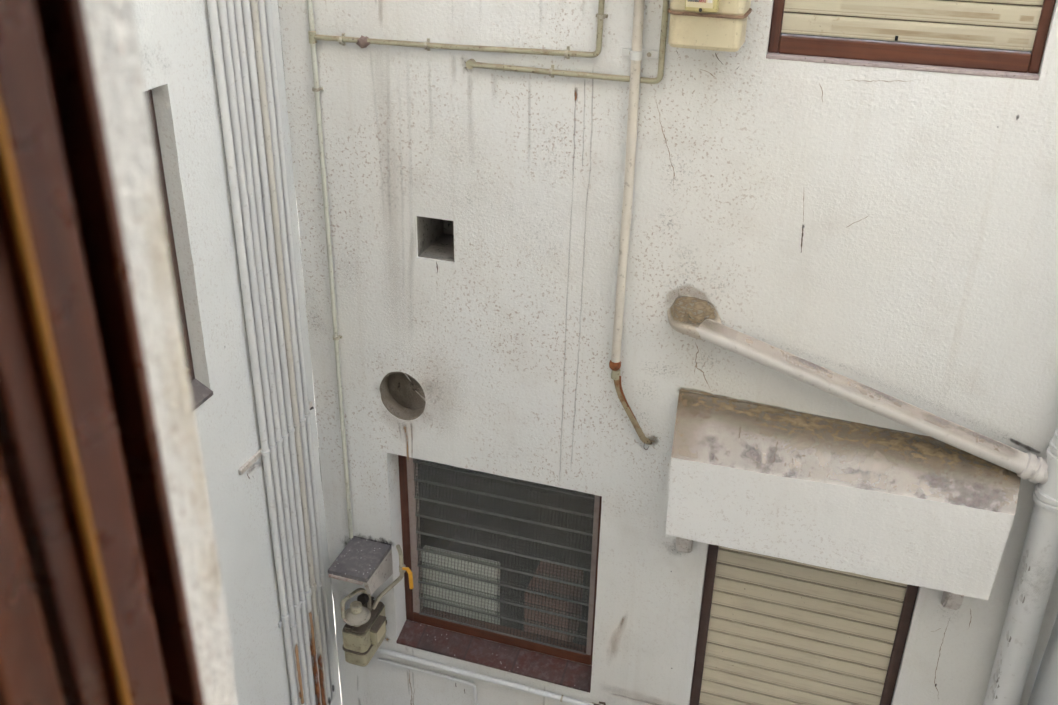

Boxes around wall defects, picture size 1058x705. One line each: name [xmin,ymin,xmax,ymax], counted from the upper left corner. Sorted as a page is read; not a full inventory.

water stain [674,388,1021,512]
water stain [974,433,1040,453]